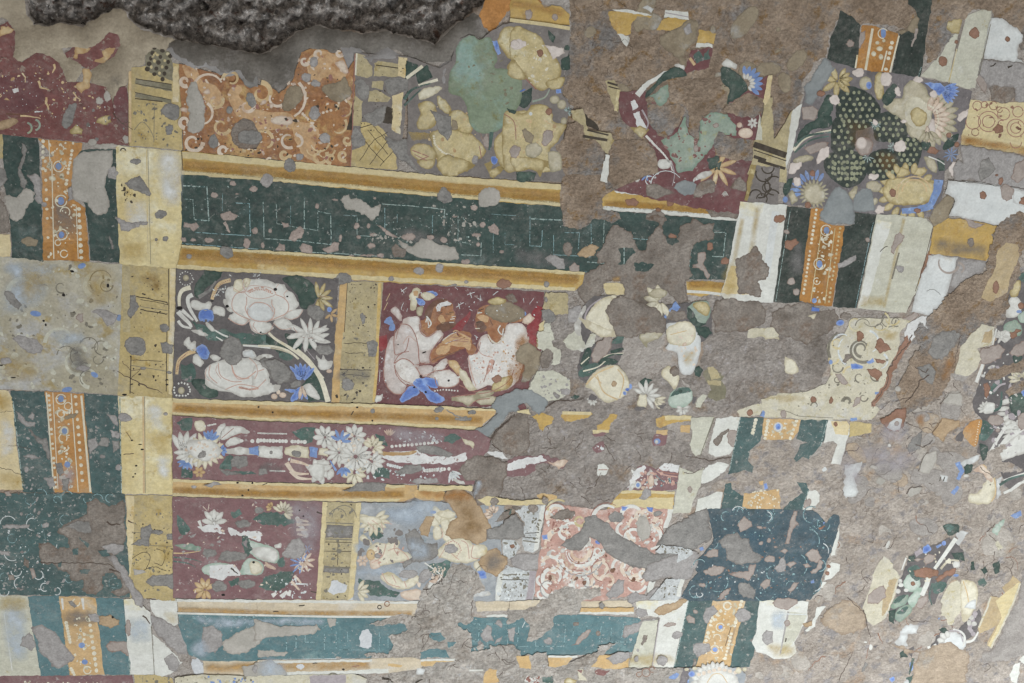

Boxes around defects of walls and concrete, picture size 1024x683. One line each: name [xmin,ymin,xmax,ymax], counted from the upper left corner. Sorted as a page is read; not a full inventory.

flaking render [335,0,1024,683]
spalling [191,455,268,496]
flaking render [3,498,336,677]
spalling [311,580,353,600]